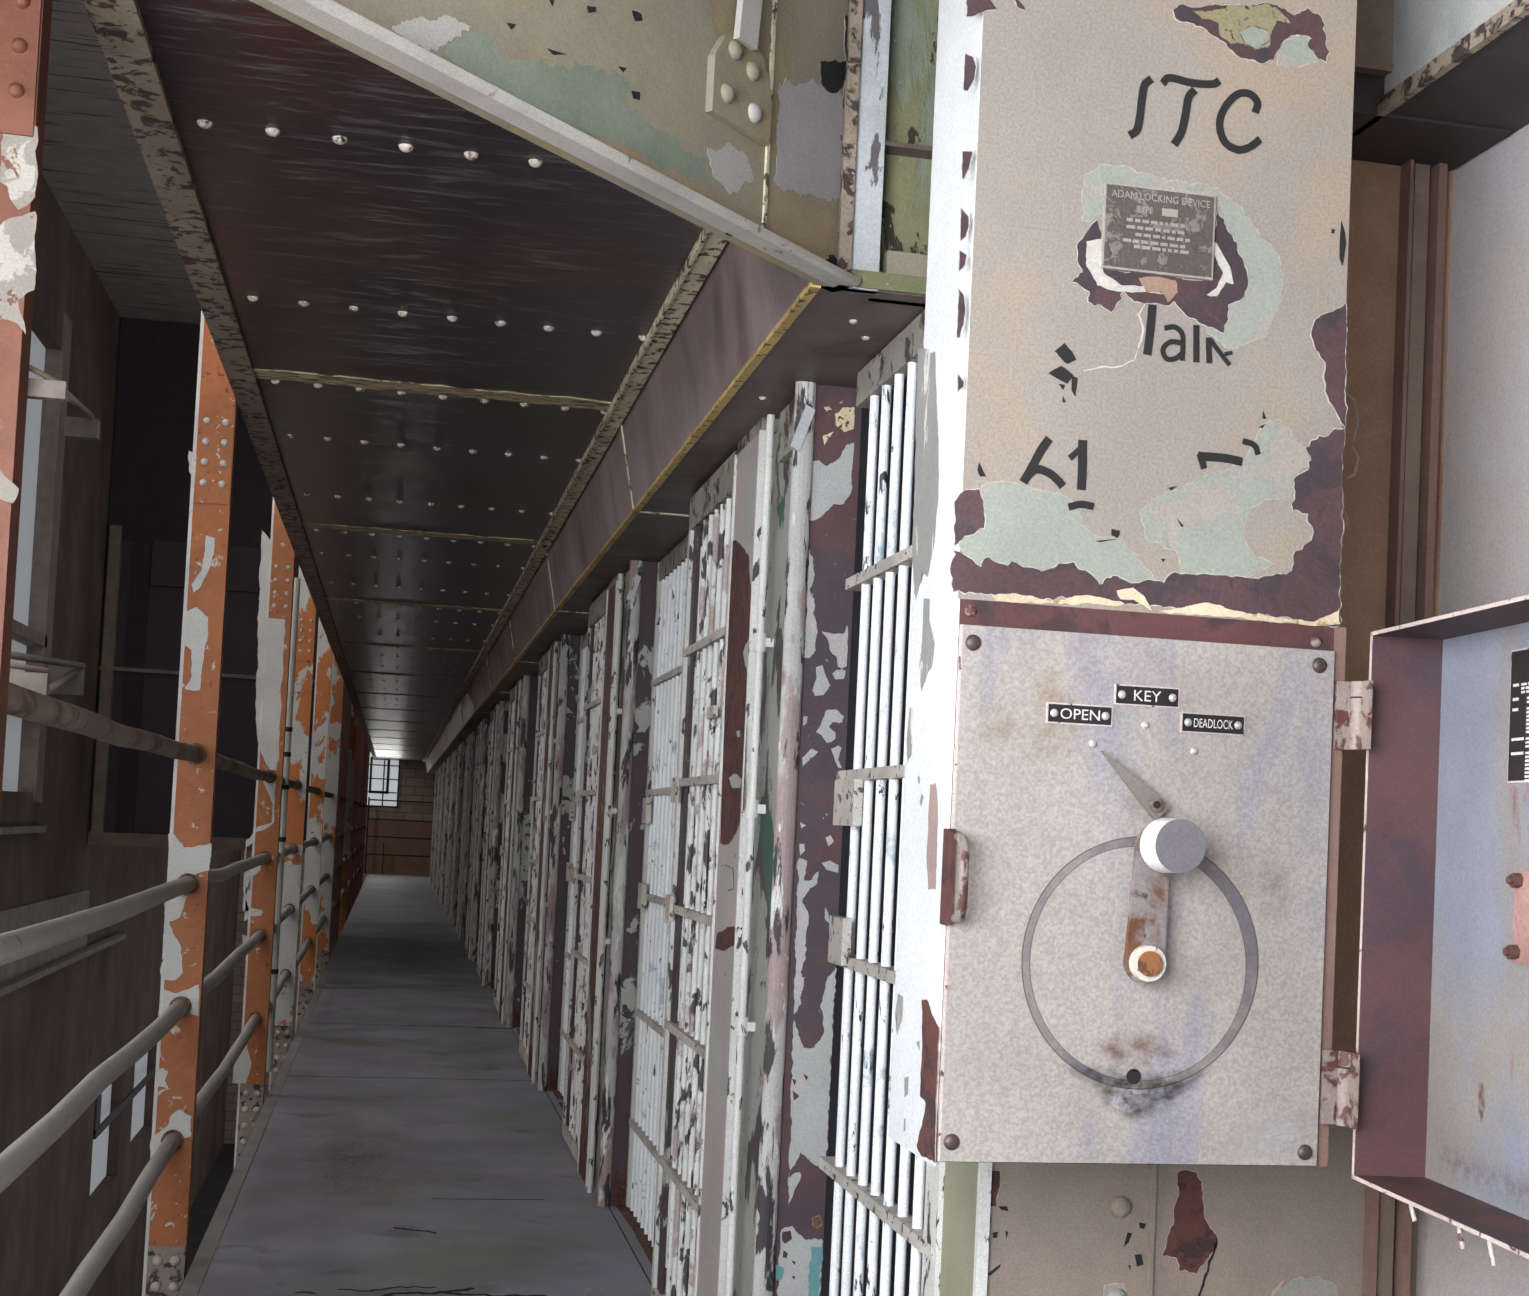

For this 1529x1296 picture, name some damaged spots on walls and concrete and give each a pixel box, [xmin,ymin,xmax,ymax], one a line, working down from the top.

peeling [1172,2,1330,68]
peeling [0,126,39,334]
peeling [392,15,845,266]
peeling [912,302,1360,691]
peeling [184,535,215,691]
peeling [720,540,751,846]
peeling [801,550,849,768]
peeling [158,832,212,1016]
peeling [787,822,839,1206]
peeling [776,1225,823,1296]
peeling [1162,1169,1219,1274]
crack [1198,1240,1217,1296]